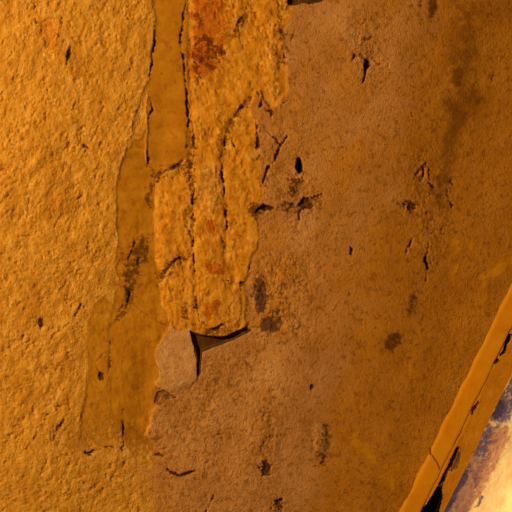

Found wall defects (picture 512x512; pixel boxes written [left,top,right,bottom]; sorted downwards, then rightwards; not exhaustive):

corrosion [184,0,230,85]
crack [155,6,196,274]
crack [255,124,287,183]
flaking render [77,0,322,458]
leakage [253,275,281,334]
leakage [384,333,401,351]
crack [493,333,512,365]
crack [470,401,480,415]
crack [420,446,461,512]